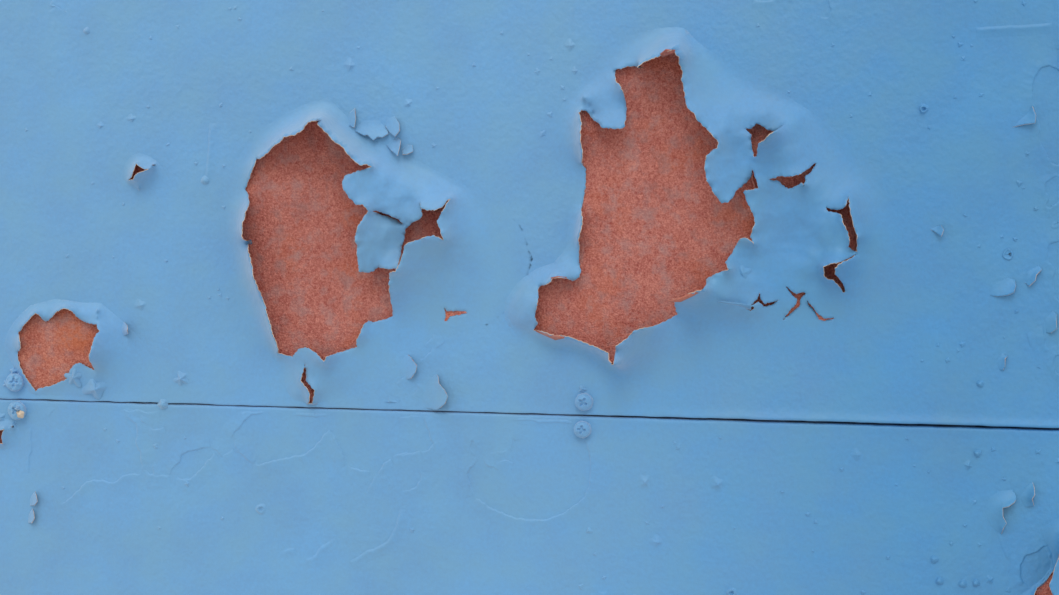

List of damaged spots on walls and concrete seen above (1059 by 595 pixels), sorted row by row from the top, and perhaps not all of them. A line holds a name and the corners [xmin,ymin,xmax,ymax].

peeling [121,153,169,191]
peeling [219,27,903,410]
peeling [4,299,154,397]
peeling [0,419,19,449]
peeling [985,490,1017,534]
peeling [1020,518,1059,595]